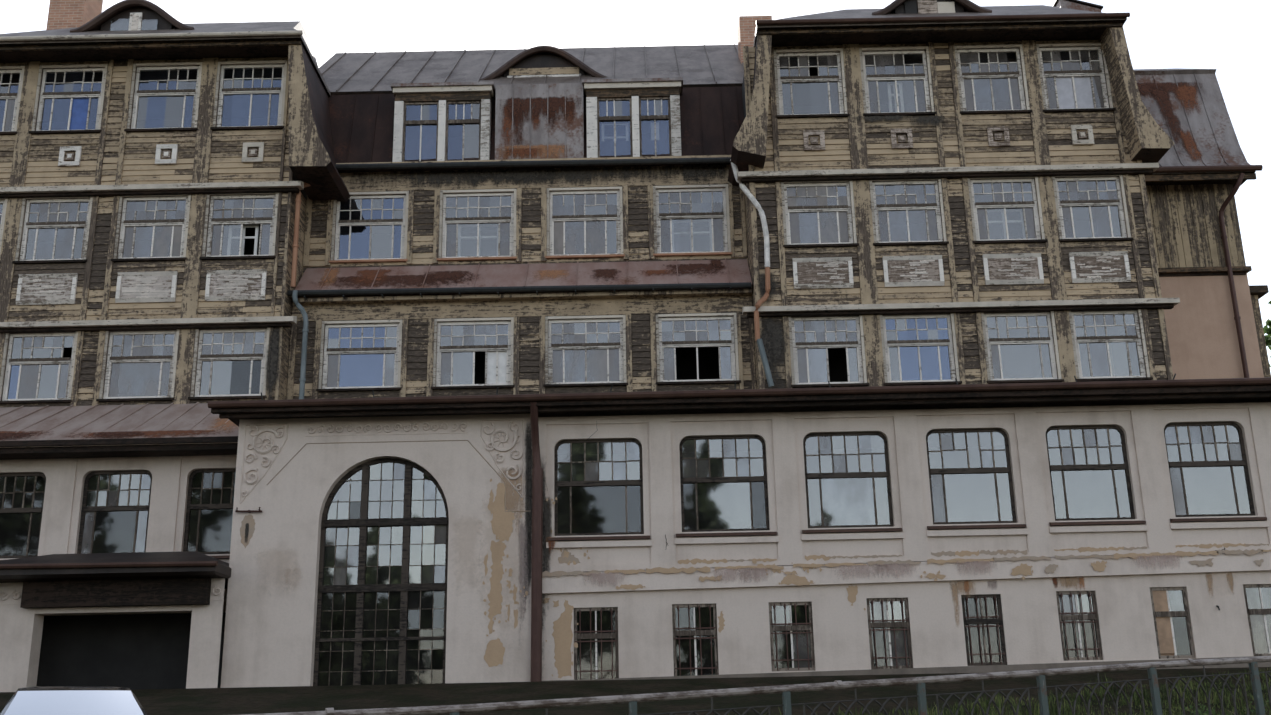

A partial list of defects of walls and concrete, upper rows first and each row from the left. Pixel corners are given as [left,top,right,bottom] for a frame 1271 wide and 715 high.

rust [500,97,580,159]
rust [1137,82,1202,160]
rust [319,268,472,288]
rust [593,269,621,281]
rust [645,260,725,276]
peeling [813,262,848,283]
peeling [891,260,935,282]
peeling [1077,256,1121,278]
peeling [23,279,69,300]
flaking render [482,479,528,667]
flaking render [542,543,1271,590]
flaking render [544,598,578,678]